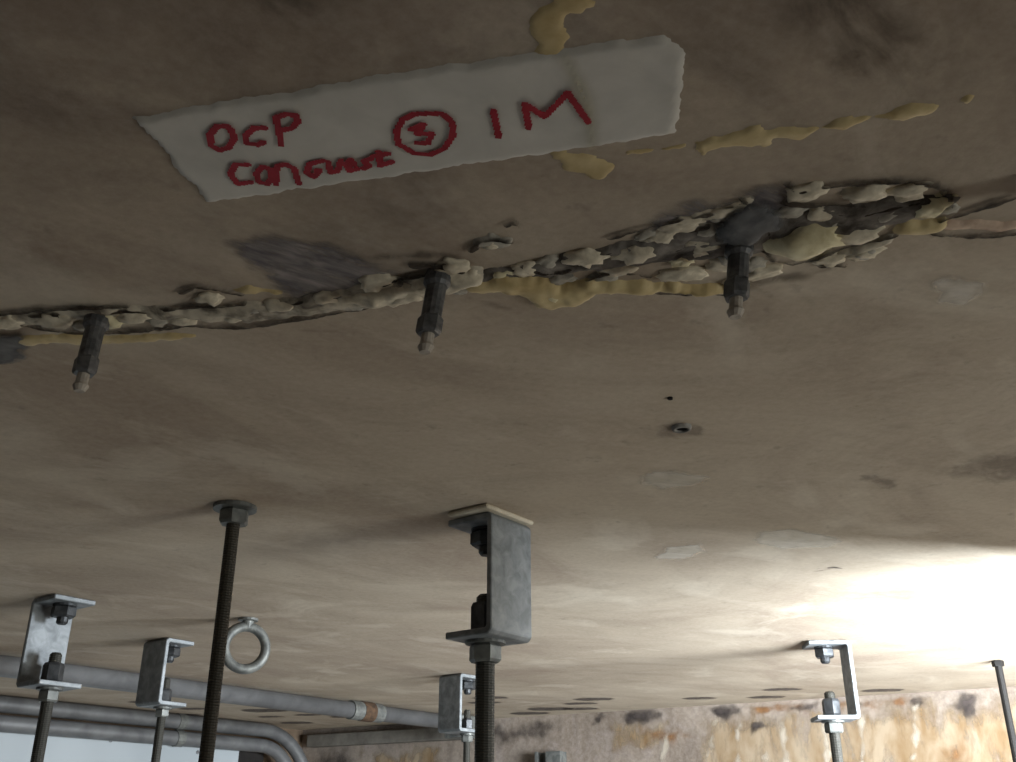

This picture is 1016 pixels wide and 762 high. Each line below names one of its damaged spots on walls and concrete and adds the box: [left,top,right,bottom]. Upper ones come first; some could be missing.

crack [0,180,1016,346]
water stain [626,710,660,724]
water stain [712,707,739,722]
water stain [957,695,976,717]